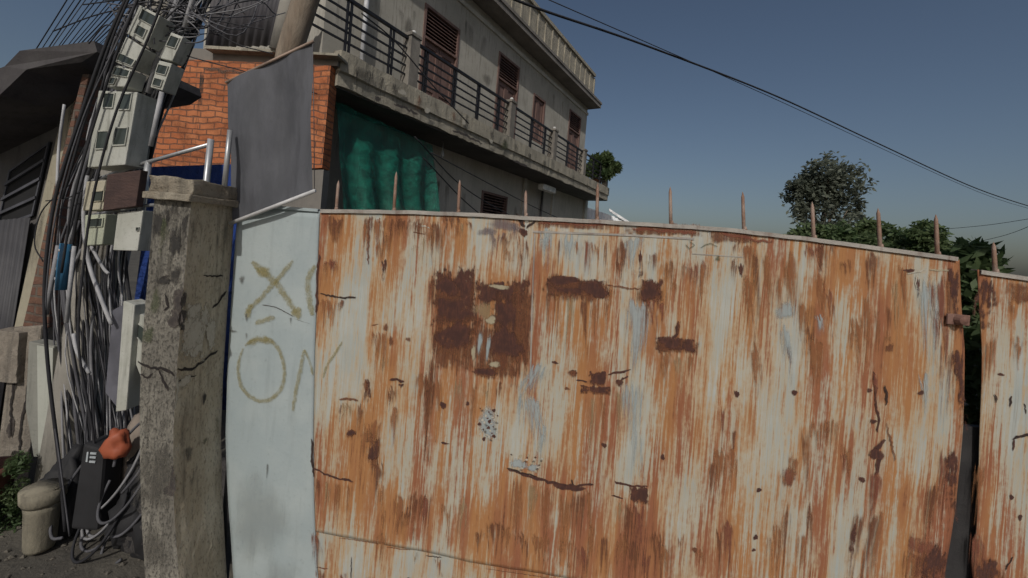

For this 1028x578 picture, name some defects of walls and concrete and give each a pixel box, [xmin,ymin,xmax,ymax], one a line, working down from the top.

corrosion [363,216,471,275]
corrosion [538,221,609,259]
crack [161,275,169,311]
corrosion [546,251,706,374]
corrosion [576,224,836,375]
corrosion [849,251,965,409]
crack [138,351,218,391]
corrosion [339,266,533,559]
corrosion [565,369,631,430]
corrosion [476,481,703,578]
corrosion [752,505,812,568]
corrosion [849,512,883,578]